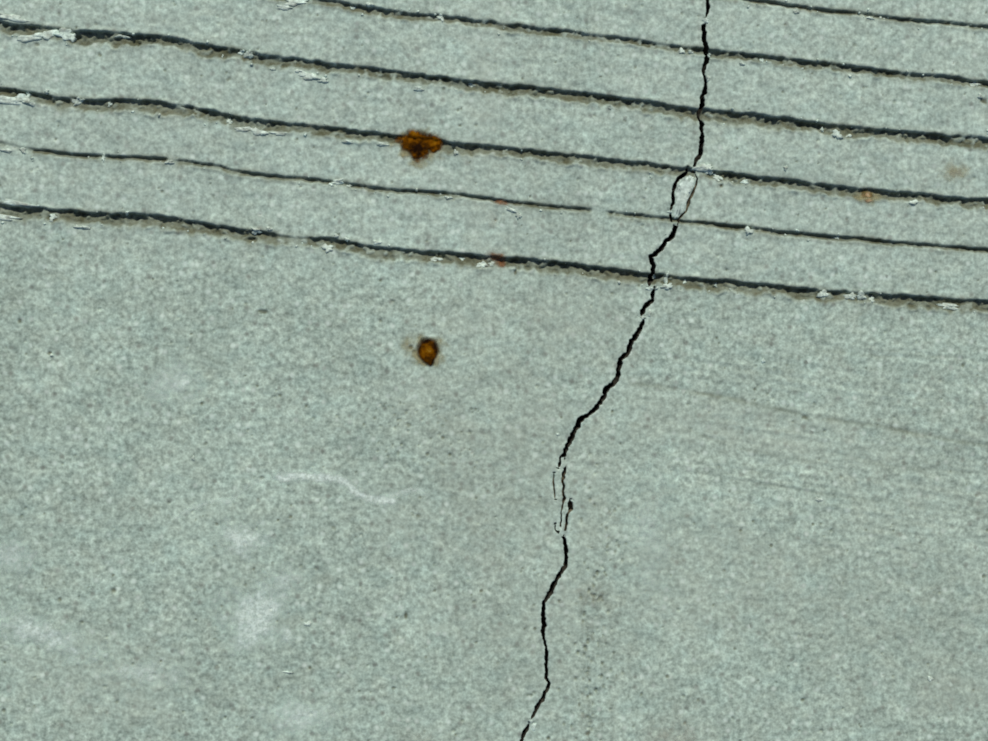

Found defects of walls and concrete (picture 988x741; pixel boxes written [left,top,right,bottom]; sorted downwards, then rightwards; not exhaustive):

rust [395,130,442,167]
rust [406,336,441,366]
crack [520,0,711,741]